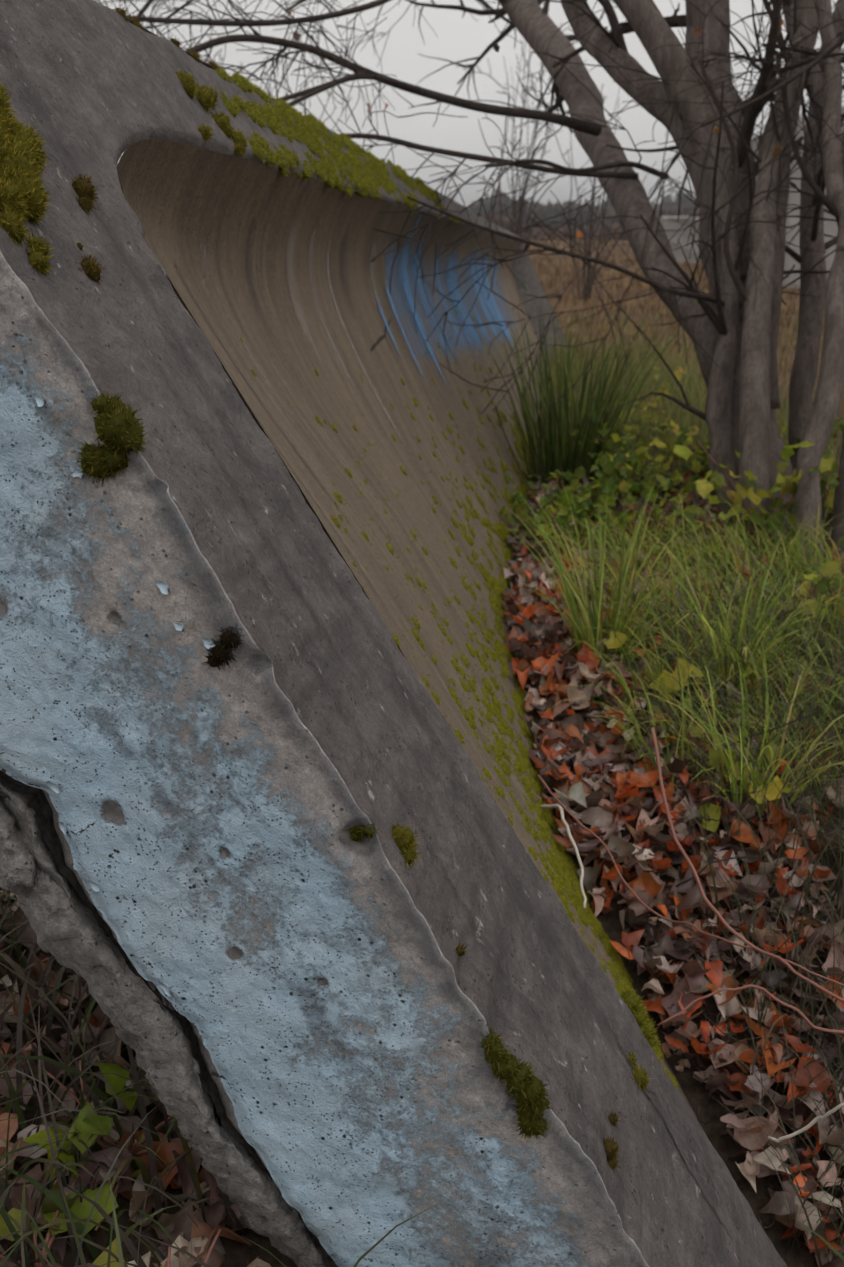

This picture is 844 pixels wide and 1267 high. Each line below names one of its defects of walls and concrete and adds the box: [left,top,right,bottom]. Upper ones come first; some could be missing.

peeling [379,216,511,373]
crack [0,767,316,1236]
peeling [0,338,605,1267]